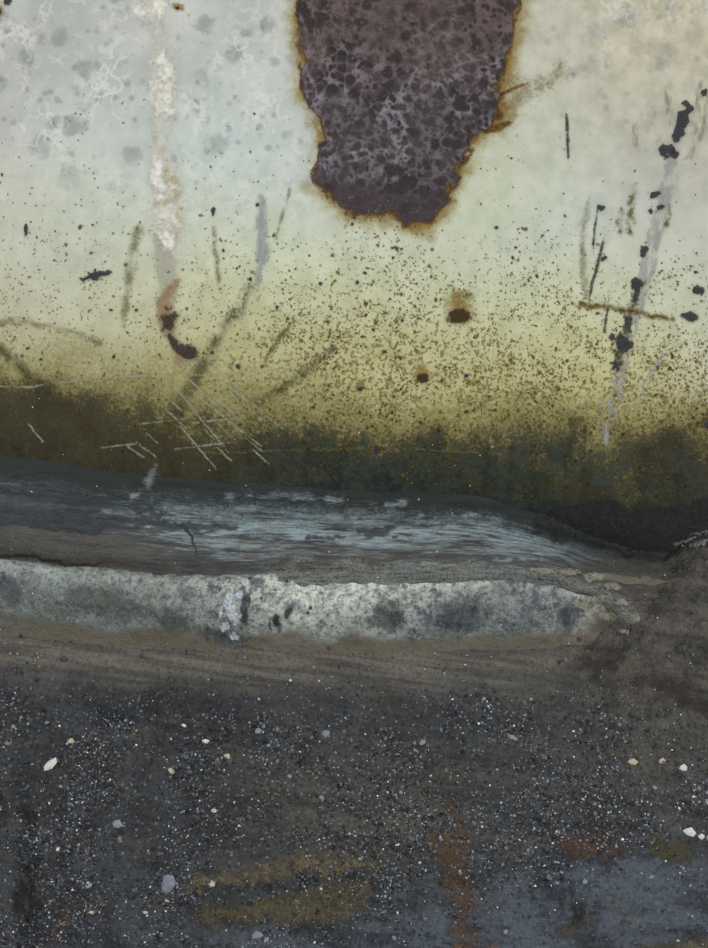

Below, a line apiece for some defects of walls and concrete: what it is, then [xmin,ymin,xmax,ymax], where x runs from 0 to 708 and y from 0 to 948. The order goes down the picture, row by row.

rust [0,0,708,514]